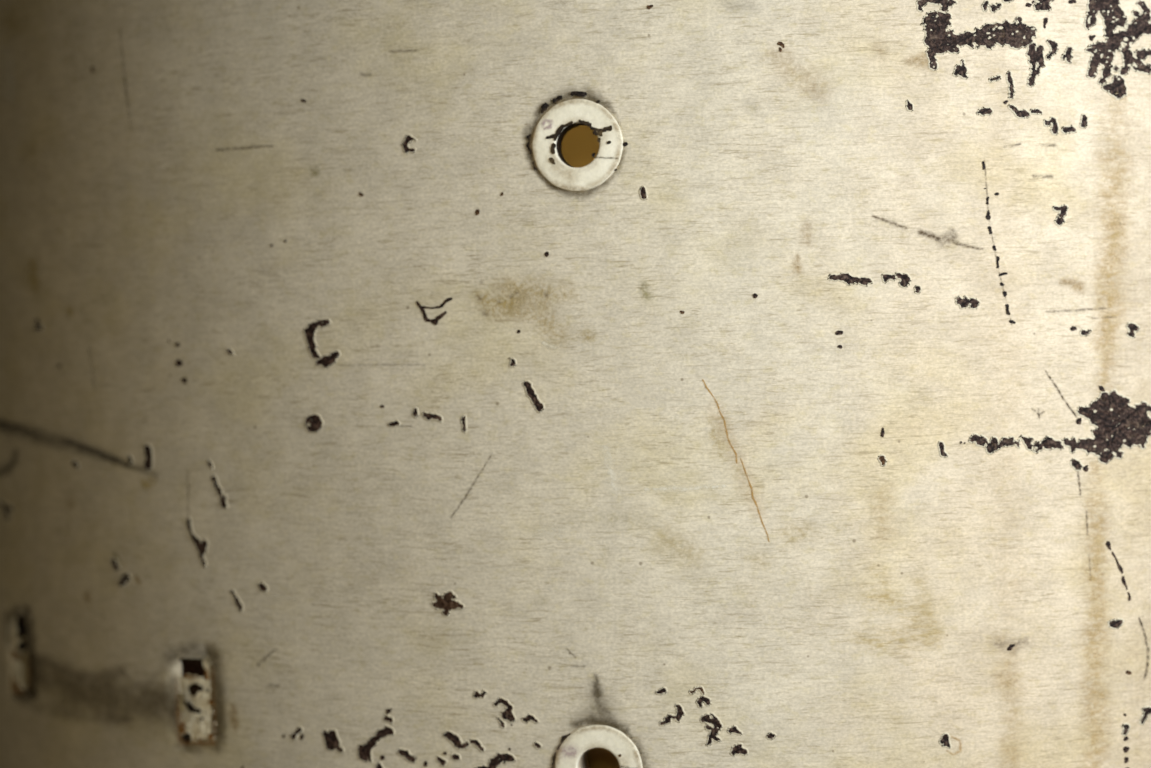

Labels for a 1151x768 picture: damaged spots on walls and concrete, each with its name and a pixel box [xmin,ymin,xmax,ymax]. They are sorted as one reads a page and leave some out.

rust [541,91,600,113]
rust [526,134,538,170]
rust [176,674,215,745]